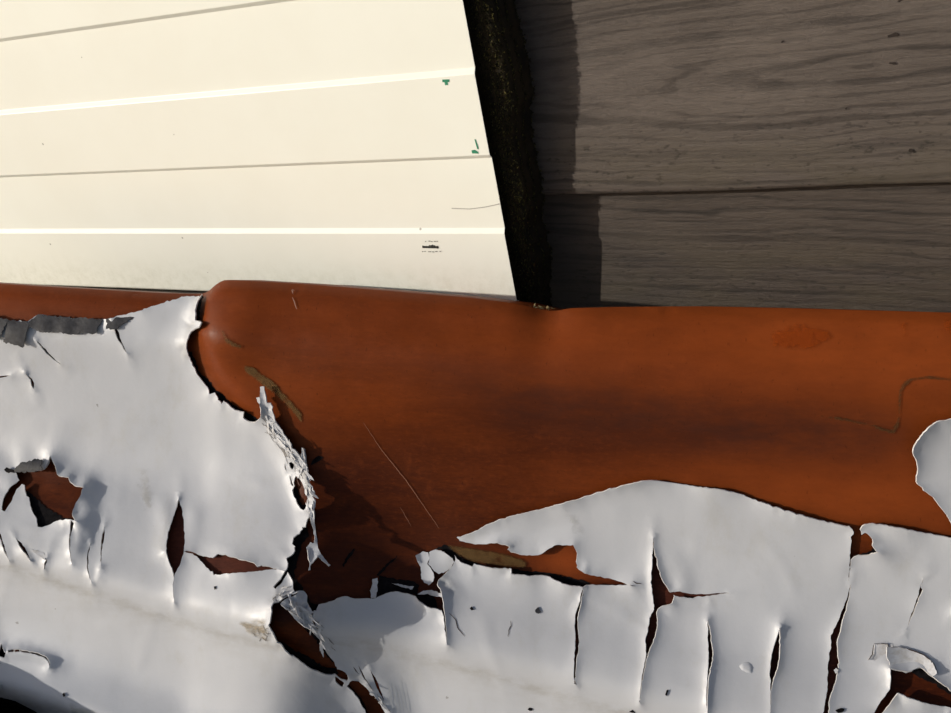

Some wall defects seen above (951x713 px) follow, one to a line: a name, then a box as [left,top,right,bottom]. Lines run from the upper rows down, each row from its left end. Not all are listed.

peeling [0,280,951,657]
crack [574,603,582,684]
crack [631,554,721,656]
crack [707,629,715,673]
crack [771,636,780,686]
crack [824,595,849,713]
crack [868,643,951,713]